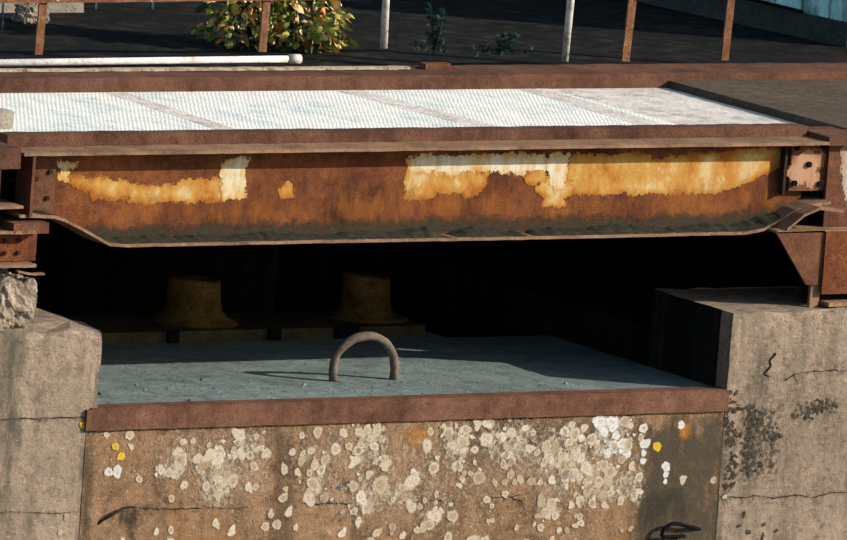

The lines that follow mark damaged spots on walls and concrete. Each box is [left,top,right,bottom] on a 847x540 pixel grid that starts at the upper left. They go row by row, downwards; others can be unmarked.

peeling [57,156,252,206]
peeling [403,146,827,209]
peeling [839,146,847,206]
crack [763,353,847,381]
crack [3,415,81,423]
corrosion [408,426,430,447]
crack [712,492,847,509]